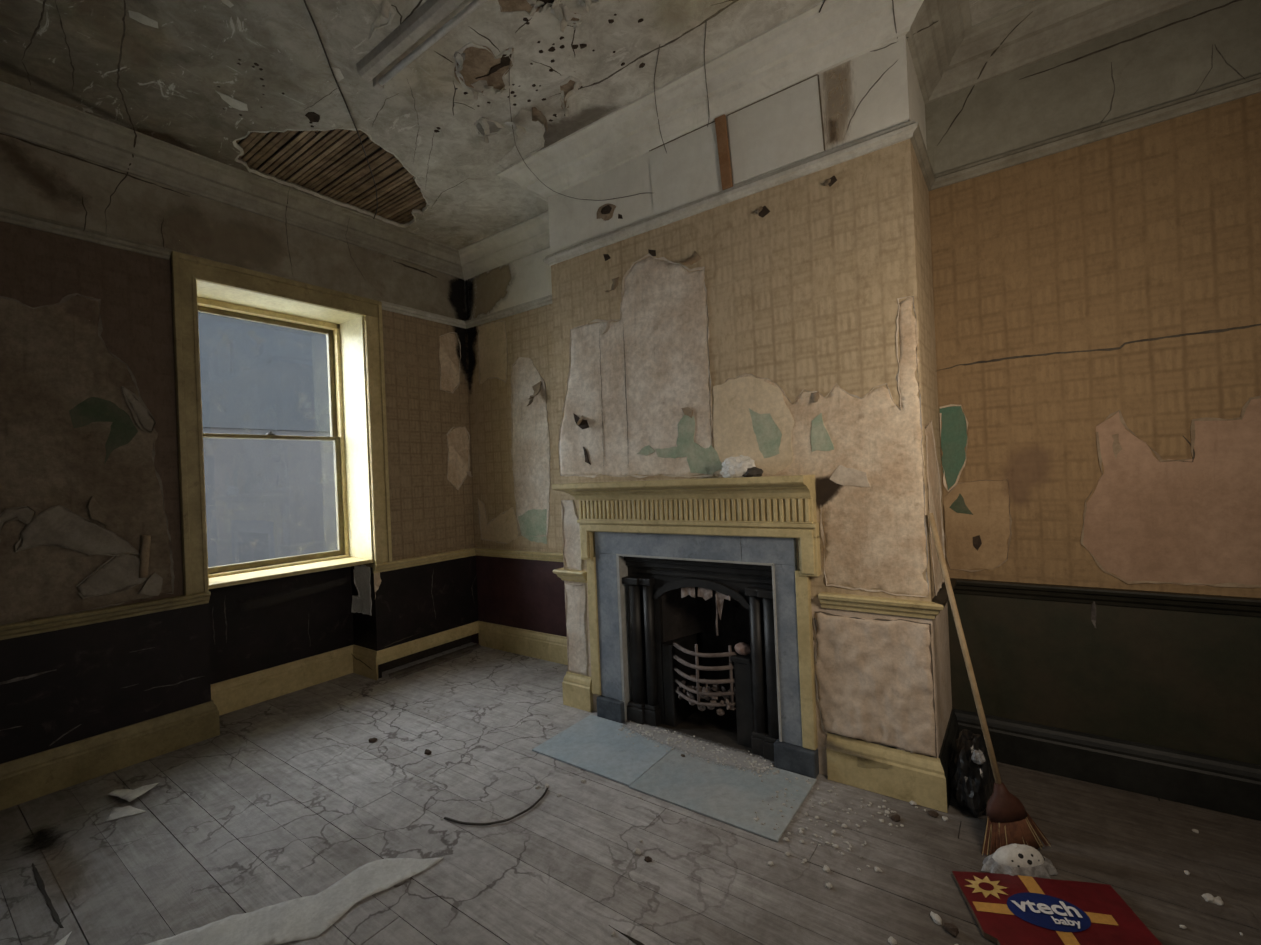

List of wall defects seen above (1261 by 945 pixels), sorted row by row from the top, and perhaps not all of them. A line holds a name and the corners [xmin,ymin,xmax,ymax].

crack [0,0,190,247]
flaking render [233,112,431,228]
crack [373,51,475,205]
crack [468,19,531,52]
peeling [453,0,595,172]
crack [533,0,739,97]
crack [844,21,938,137]
crack [938,11,1033,144]
peeling [439,333,460,393]
peeling [478,257,720,675]
peeling [725,297,930,598]
peeling [1081,398,1261,586]